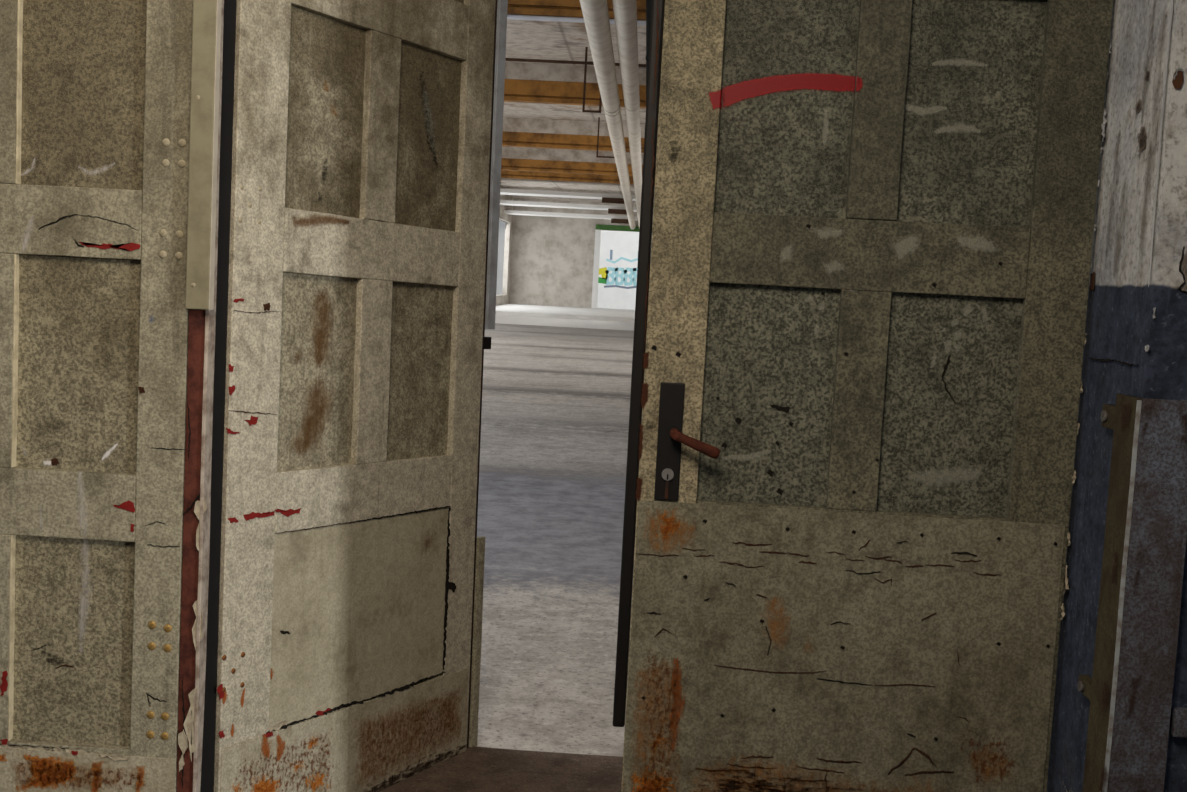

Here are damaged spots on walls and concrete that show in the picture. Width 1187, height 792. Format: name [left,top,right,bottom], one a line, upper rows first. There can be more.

spalling [1172,68,1184,89]
peeling [1135,99,1146,155]
crack [39,214,134,229]
flaking render [1178,246,1187,294]
peeling [183,494,207,551]
peeling [192,601,203,650]
peeling [178,680,198,789]
corrosion [631,651,685,792]
corrosion [0,755,145,792]
corrosion [232,733,334,792]
corrosion [700,760,876,792]